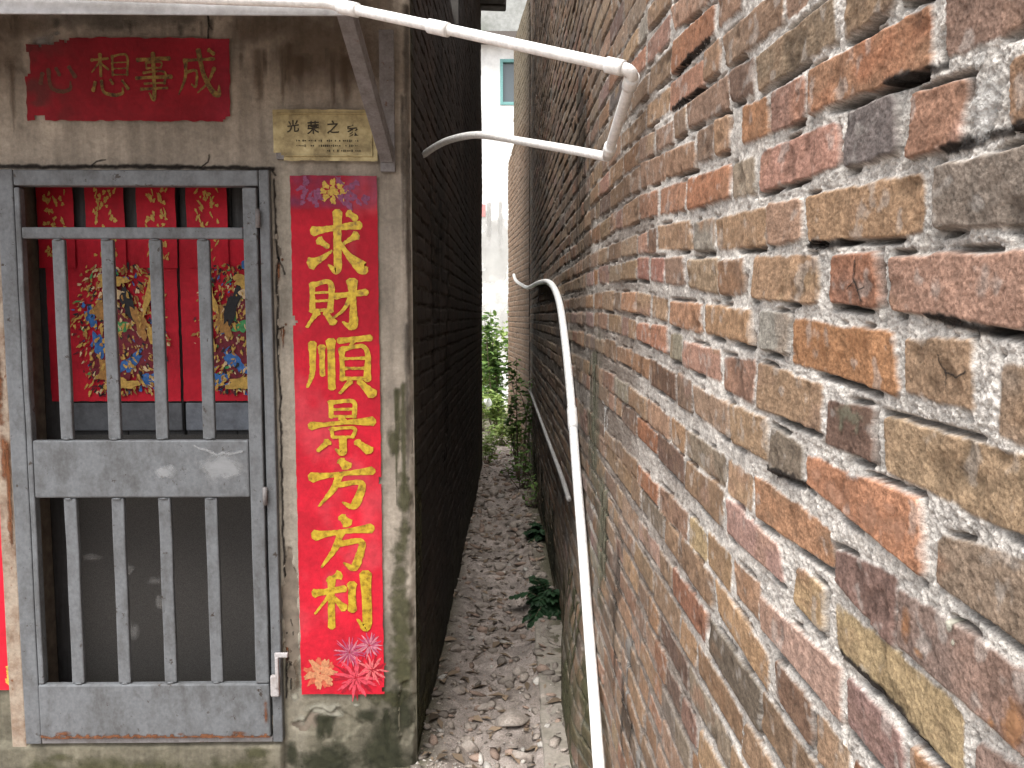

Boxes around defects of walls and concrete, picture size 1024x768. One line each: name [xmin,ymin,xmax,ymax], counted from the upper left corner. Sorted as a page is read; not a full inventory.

crack [847,257,864,302]
crack [938,355,966,386]
water stain [394,383,406,488]
corrosion [41,703,270,739]
water stain [315,715,334,739]